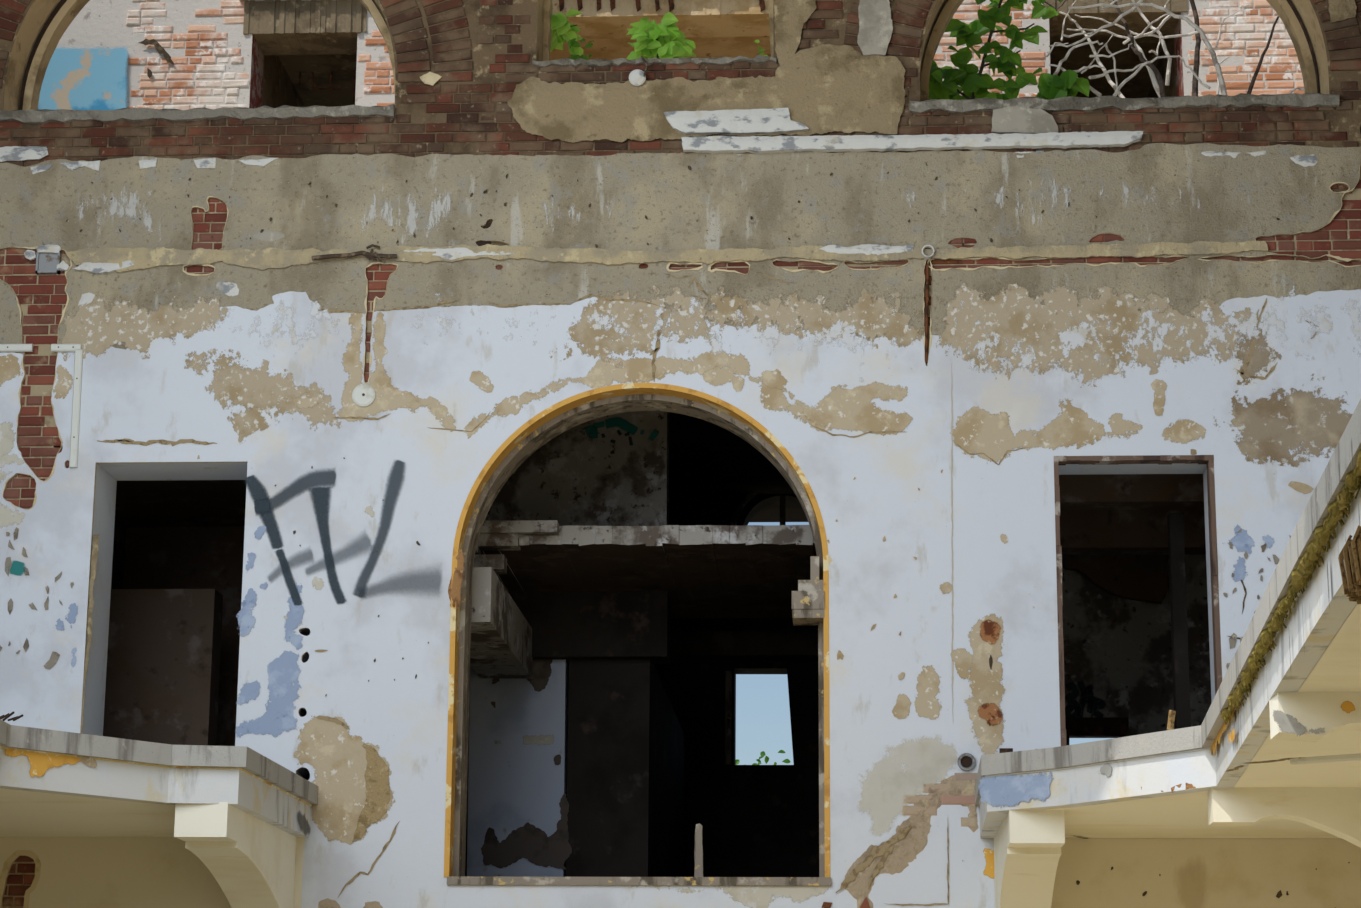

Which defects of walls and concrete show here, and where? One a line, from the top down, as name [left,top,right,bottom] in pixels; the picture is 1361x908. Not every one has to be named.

peeling [0,164,1361,576]
damp [1215,322,1353,479]
spalling [448,549,464,610]
peeling [940,582,953,594]
peeling [236,577,324,738]
peeling [892,665,942,720]
peeling [951,614,1006,755]
damp [1273,710,1325,736]
spalling [0,850,41,908]
spalling [632,773,979,908]
crack [836,824,949,908]
peeling [983,848,994,879]